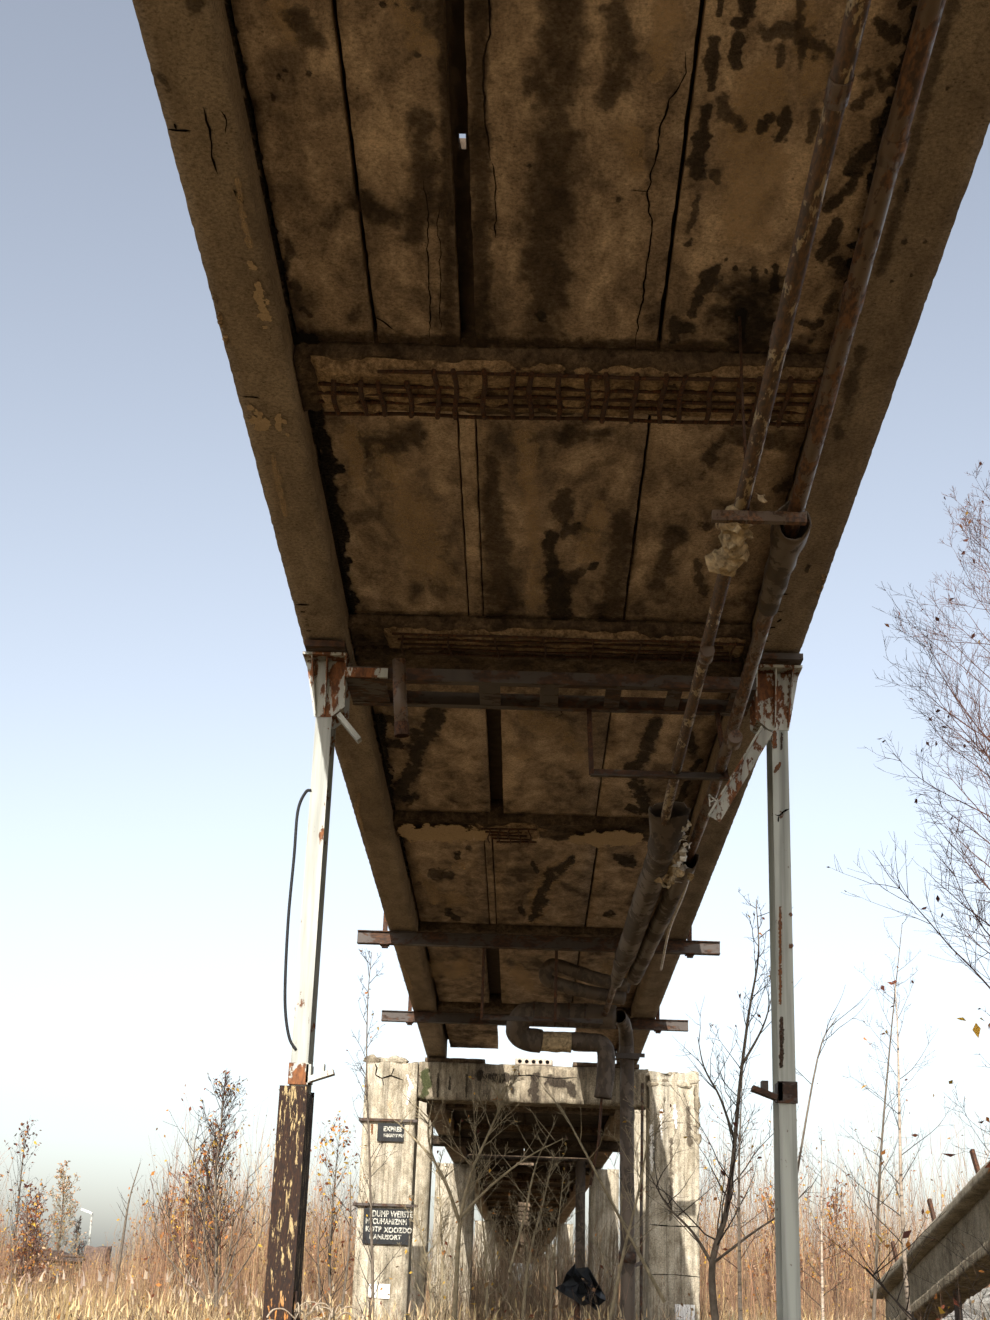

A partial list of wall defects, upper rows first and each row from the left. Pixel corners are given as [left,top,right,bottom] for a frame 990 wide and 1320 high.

damp [297,0,780,353]
crack [633,52,687,340]
damp [683,0,835,247]
damp [786,63,896,355]
damp [873,0,958,275]
spalling [311,355,765,428]
spalling [769,367,823,428]
damp [541,488,635,622]
damp [379,708,447,805]
spalling [398,823,547,845]
damp [518,855,575,922]
spalling [567,830,644,848]